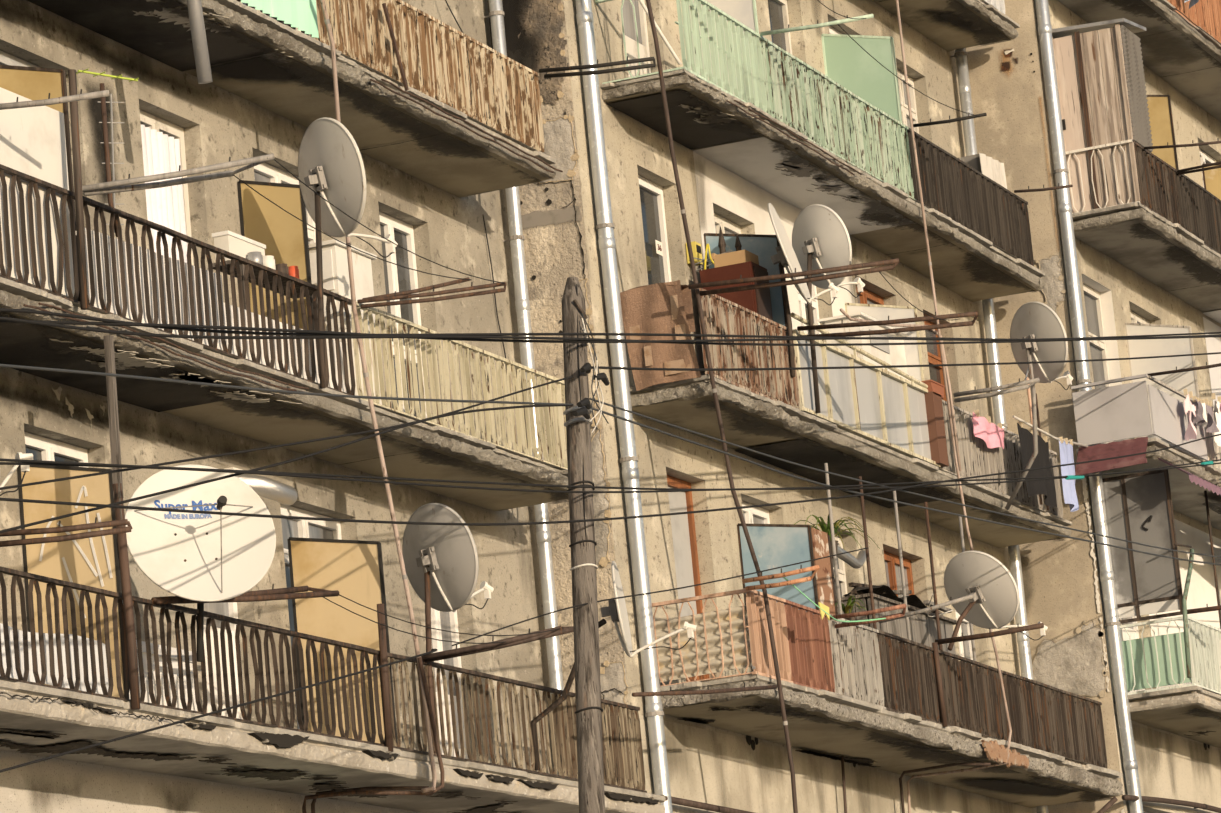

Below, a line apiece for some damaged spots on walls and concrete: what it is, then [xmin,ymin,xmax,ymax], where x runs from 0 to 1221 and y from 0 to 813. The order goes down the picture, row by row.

water stain [679,90,1037,292]
water stain [1129,223,1221,285]
peeling [23,302,309,404]
peeling [52,386,106,429]
flaking render [1032,477,1110,698]